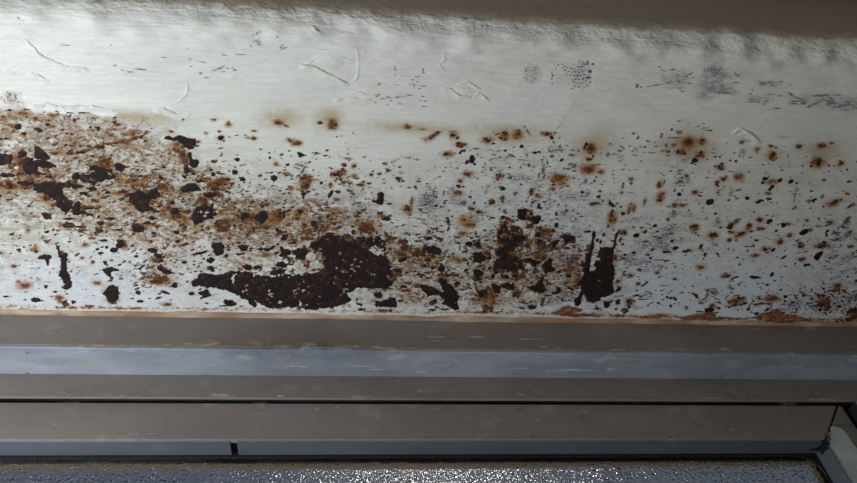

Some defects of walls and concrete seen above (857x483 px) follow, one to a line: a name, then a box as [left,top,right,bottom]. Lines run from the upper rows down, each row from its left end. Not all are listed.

rust [0,109,857,323]
peeling [296,252,323,273]
peeling [340,288,378,311]